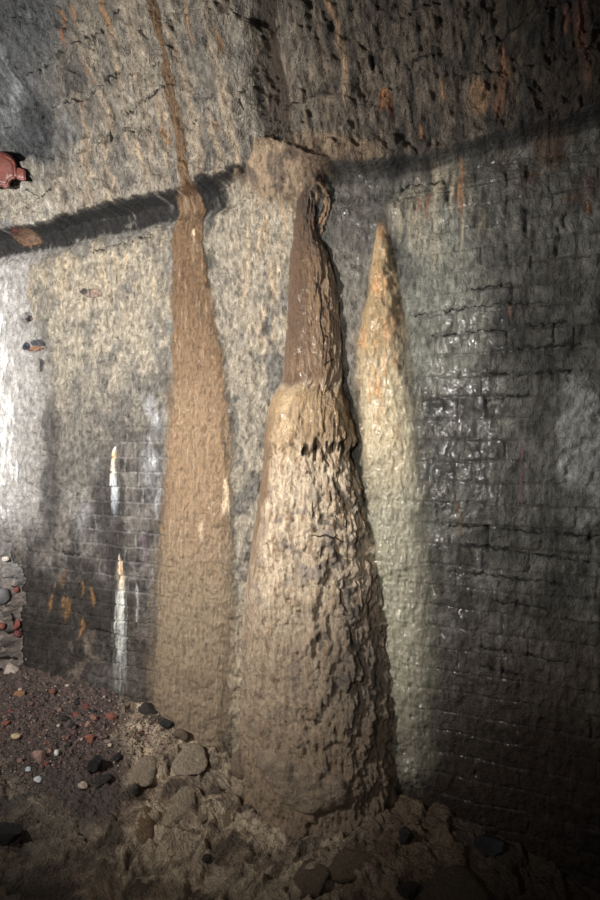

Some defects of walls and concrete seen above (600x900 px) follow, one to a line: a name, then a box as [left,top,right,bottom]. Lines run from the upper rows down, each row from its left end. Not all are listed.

damp [201,179,297,756]
rust [49,570,71,620]
damp [114,557,127,693]
damp [315,540,346,574]